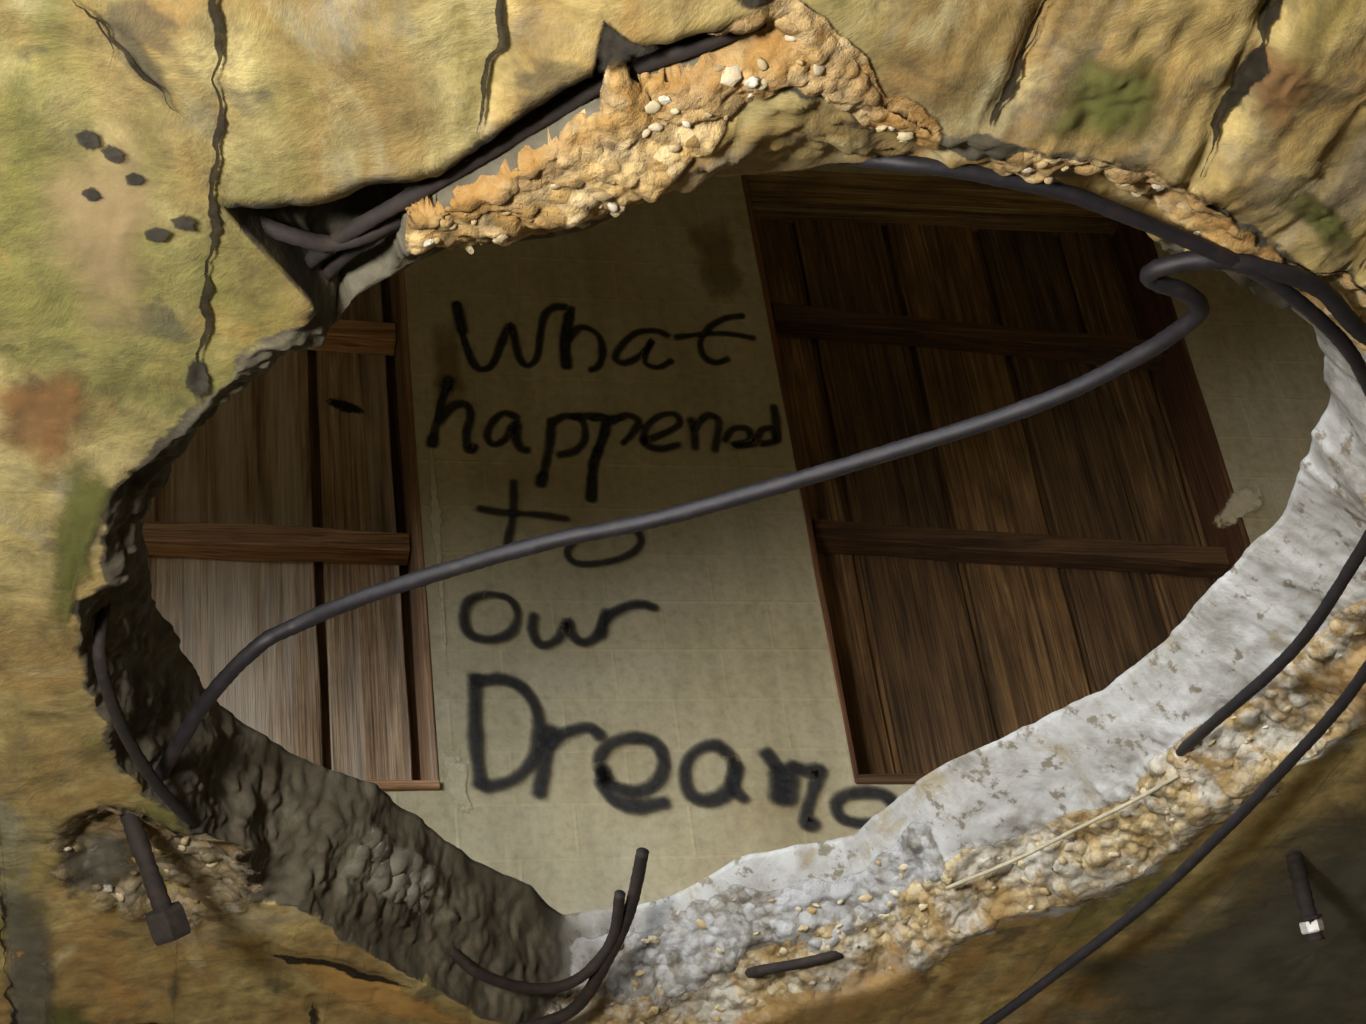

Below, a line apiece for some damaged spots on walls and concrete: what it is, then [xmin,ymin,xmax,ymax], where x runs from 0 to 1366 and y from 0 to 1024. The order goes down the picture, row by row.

spalling [75,130,143,185]
crack [72,0,224,360]
crack [477,0,506,135]
spalling [260,0,941,282]
crack [981,0,1049,143]
crack [1200,0,1281,177]
spalling [49,151,1366,927]
spalling [450,530,1366,1024]
crack [0,890,17,1024]